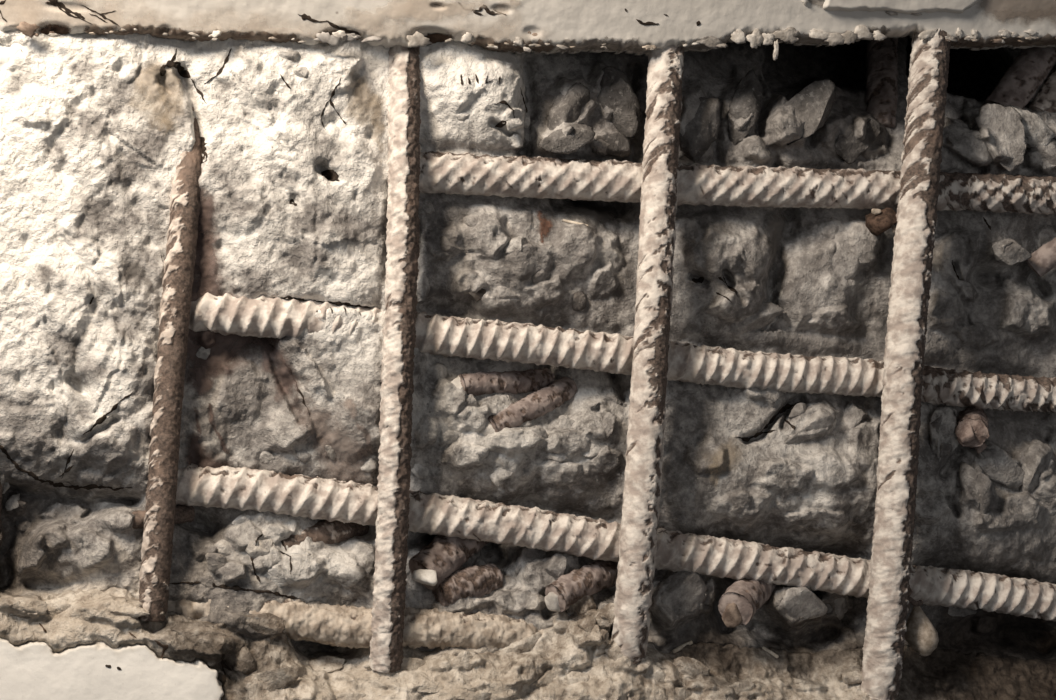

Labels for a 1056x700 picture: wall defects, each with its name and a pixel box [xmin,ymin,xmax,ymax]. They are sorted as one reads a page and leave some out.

crack [0,393,132,491]
spalling [0,22,657,673]
crack [738,401,800,442]
spalling [592,24,1056,700]